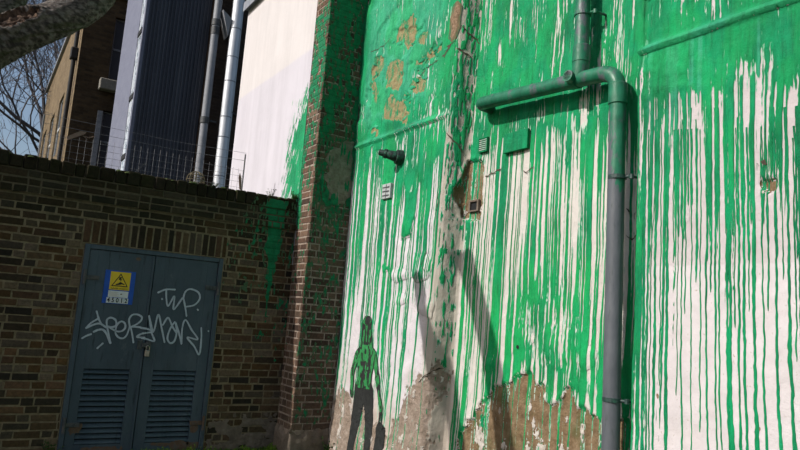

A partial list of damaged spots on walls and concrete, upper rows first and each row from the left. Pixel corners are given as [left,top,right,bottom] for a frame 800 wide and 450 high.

peeling [369,13,448,125]
spalling [453,161,484,221]
spalling [760,178,776,194]
spalling [328,359,454,450]
spalling [457,373,602,450]
spalling [620,419,631,450]